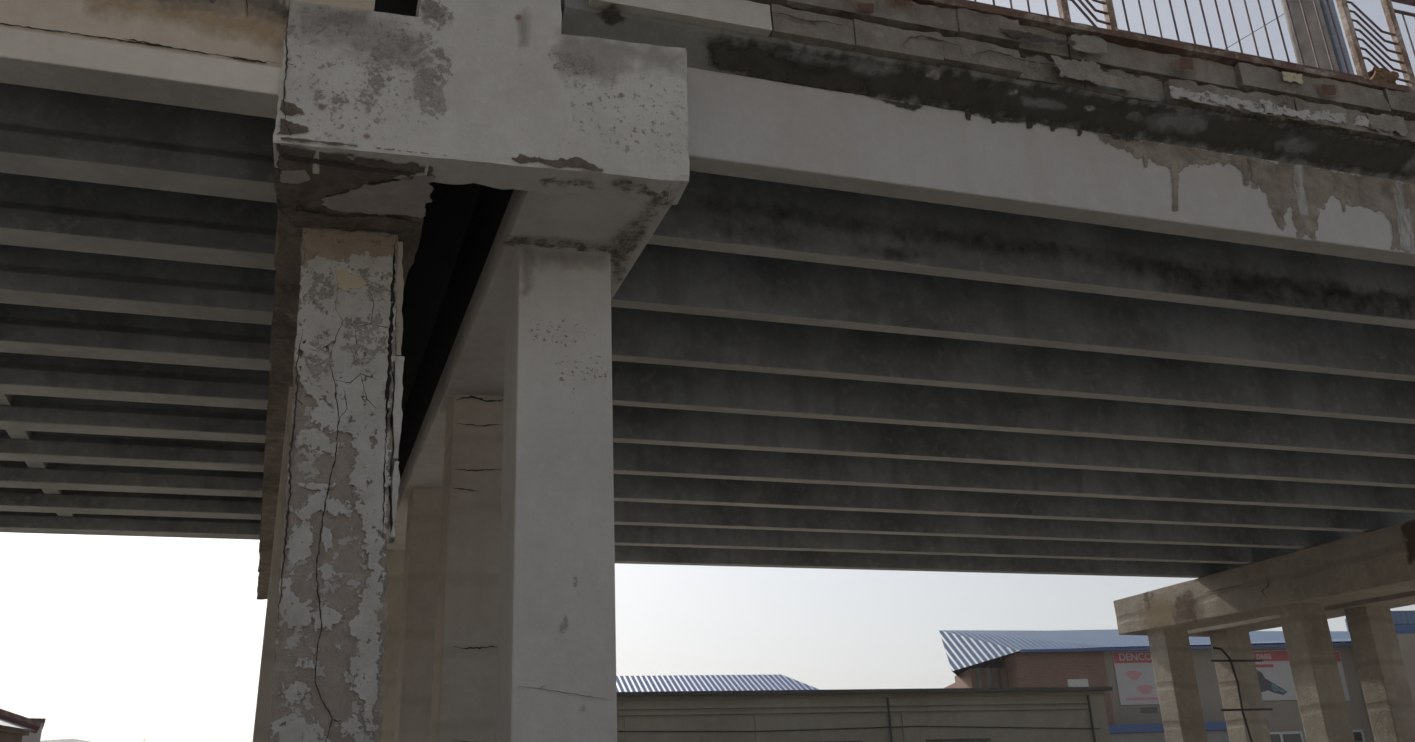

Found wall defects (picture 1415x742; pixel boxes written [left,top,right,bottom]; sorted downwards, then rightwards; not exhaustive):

water stain [602,5,624,25]
spalling [999,28,1136,91]
peeling [1282,71,1303,84]
spalling [1169,86,1409,136]
spalling [512,154,603,172]
water stain [708,37,1415,252]
peeling [270,0,454,742]
crack [278,244,396,742]